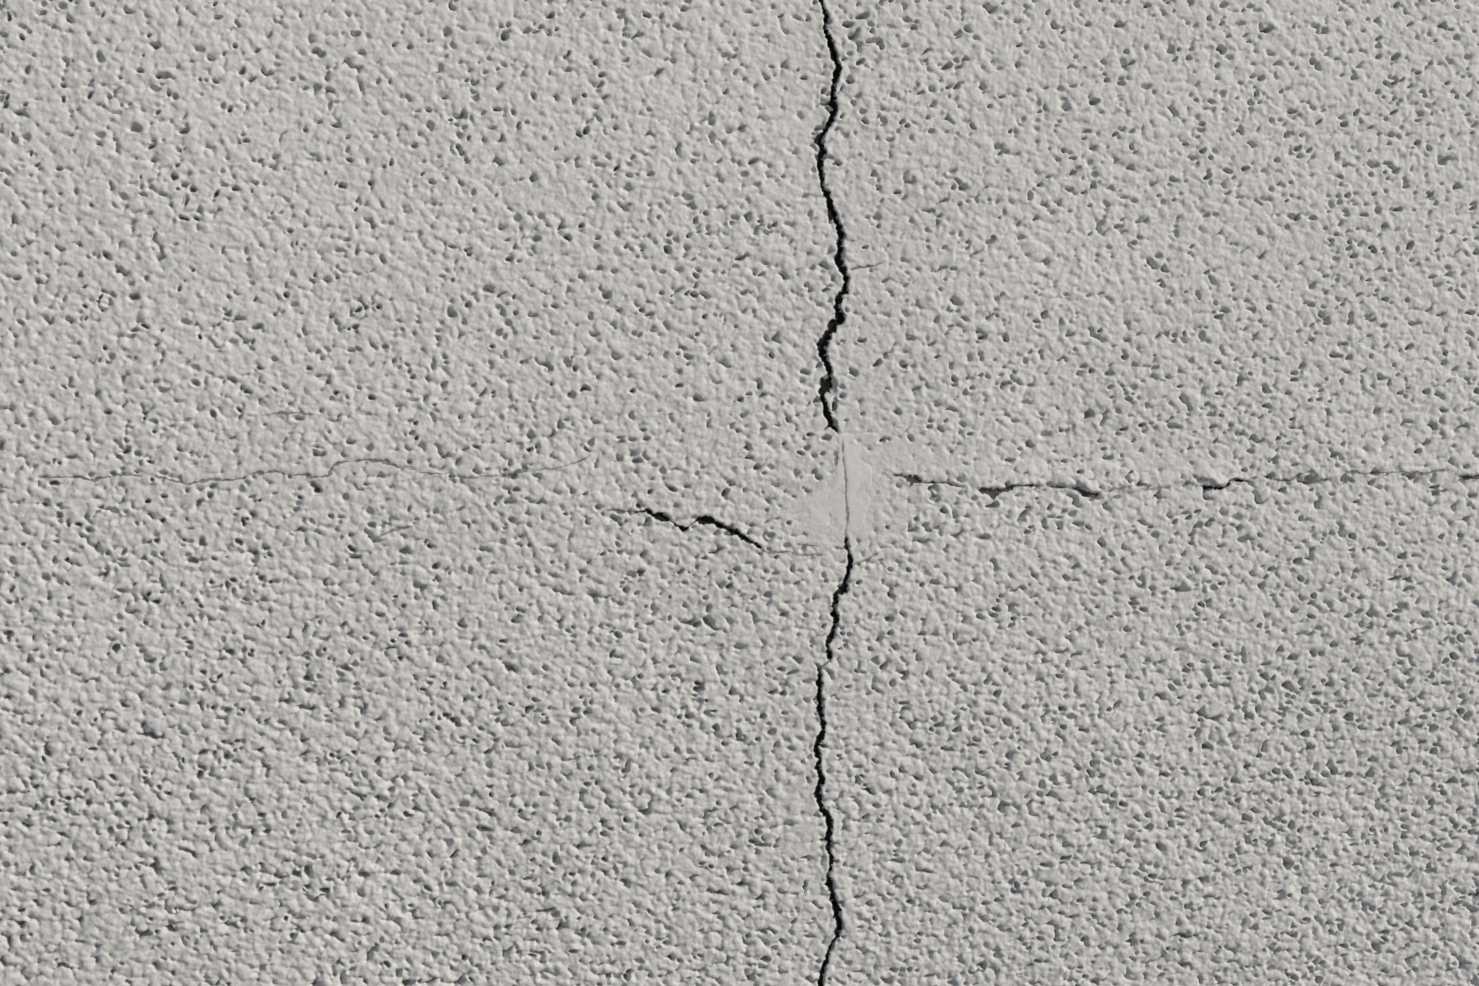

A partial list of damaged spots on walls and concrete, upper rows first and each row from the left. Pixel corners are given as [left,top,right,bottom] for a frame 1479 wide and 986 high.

crack [42,456,589,485]
crack [894,474,1152,500]
crack [1195,469,1479,490]
crack [376,525,414,539]